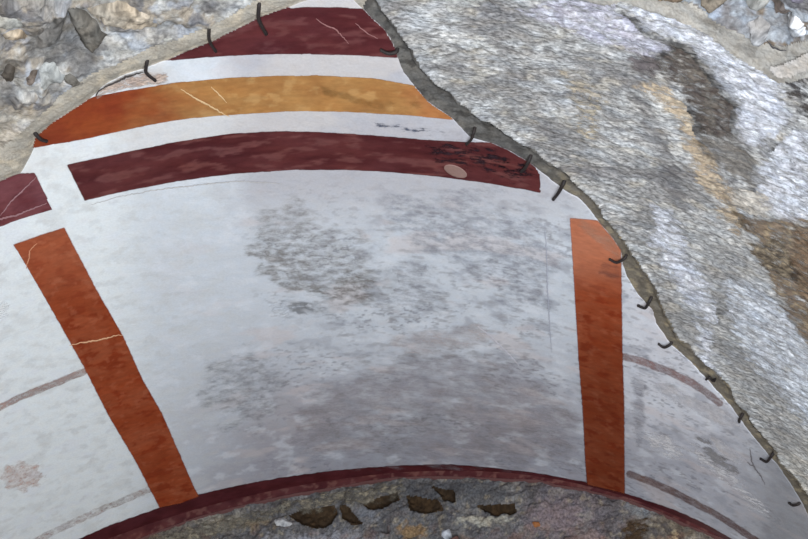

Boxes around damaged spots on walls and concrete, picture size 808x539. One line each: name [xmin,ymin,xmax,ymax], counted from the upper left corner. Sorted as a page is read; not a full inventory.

crack [317,19,378,44]
crack [181,87,230,117]
peeling [432,144,531,178]
crack [0,177,47,220]
crack [70,335,122,346]
spalling [289,505,363,529]
spalling [363,486,456,514]
spalling [477,503,517,516]